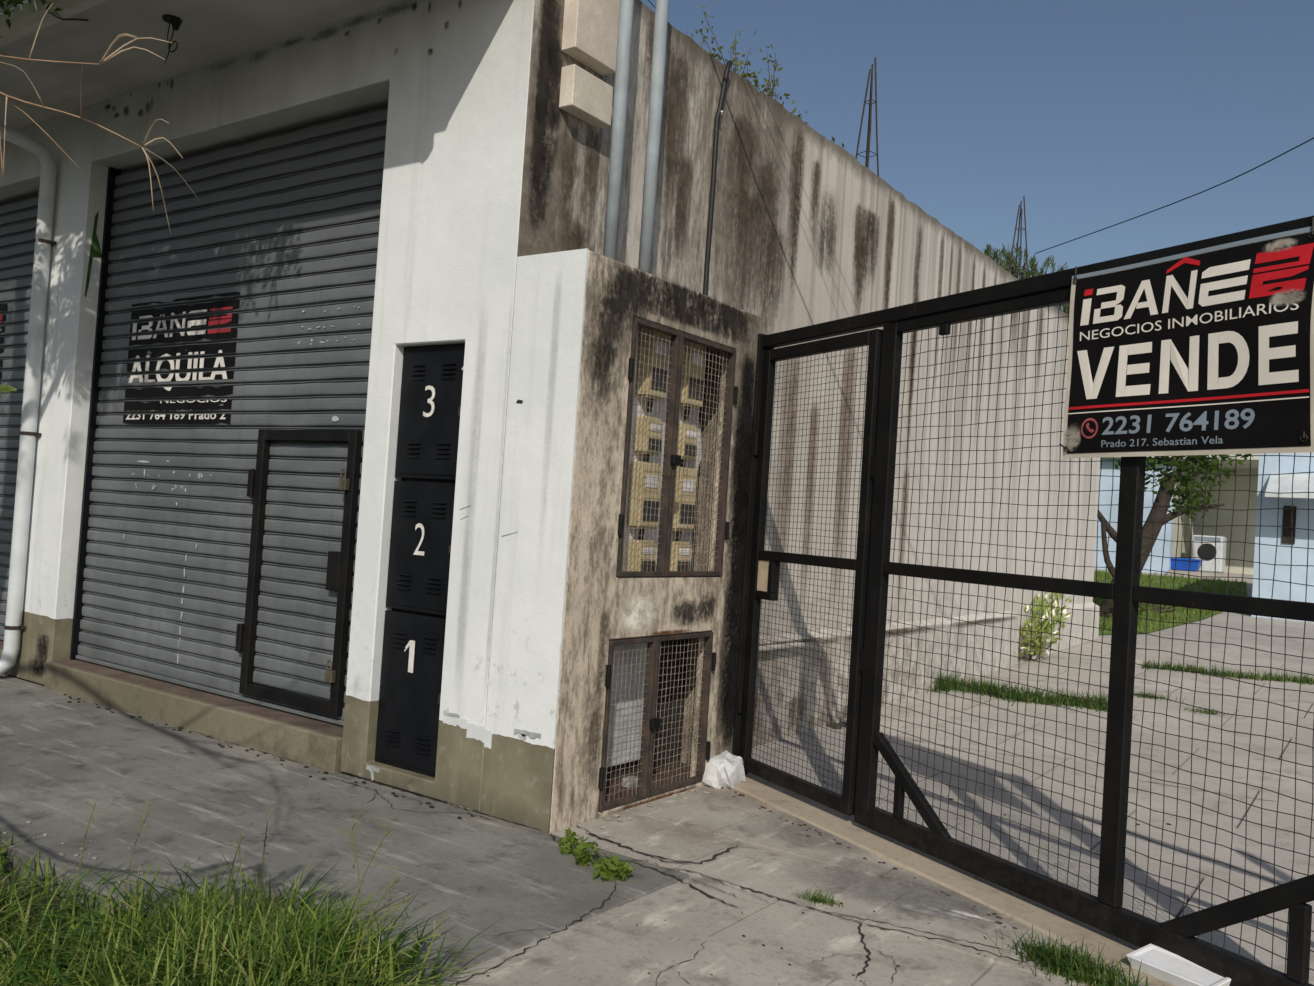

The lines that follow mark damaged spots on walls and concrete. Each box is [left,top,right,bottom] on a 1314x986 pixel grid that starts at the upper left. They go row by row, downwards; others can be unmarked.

leakage [530,0,600,251]
leakage [665,57,692,252]
leakage [735,119,835,297]
leakage [855,202,894,309]
leakage [938,240,996,297]
leakage [908,331,916,442]
leakage [936,319,994,392]
leakage [624,596,655,629]
leakage [674,596,715,625]
leakage [723,357,755,740]
leakage [589,613,607,771]
crack [331,772,1029,986]